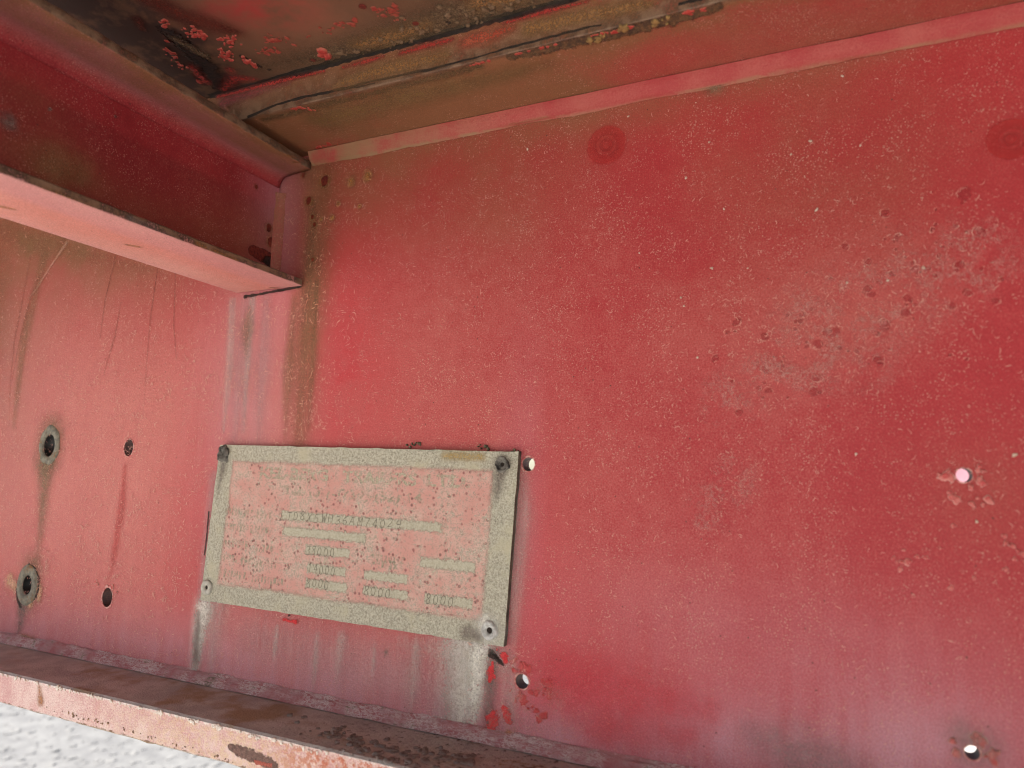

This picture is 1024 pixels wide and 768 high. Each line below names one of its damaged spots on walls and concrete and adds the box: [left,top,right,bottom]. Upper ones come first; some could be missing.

peeling [399,0,589,55]
corrosion [156,26,225,91]
peeling [158,17,358,107]
peeling [486,648,508,683]
peeling [484,705,512,730]
corrosion [228,744,278,768]